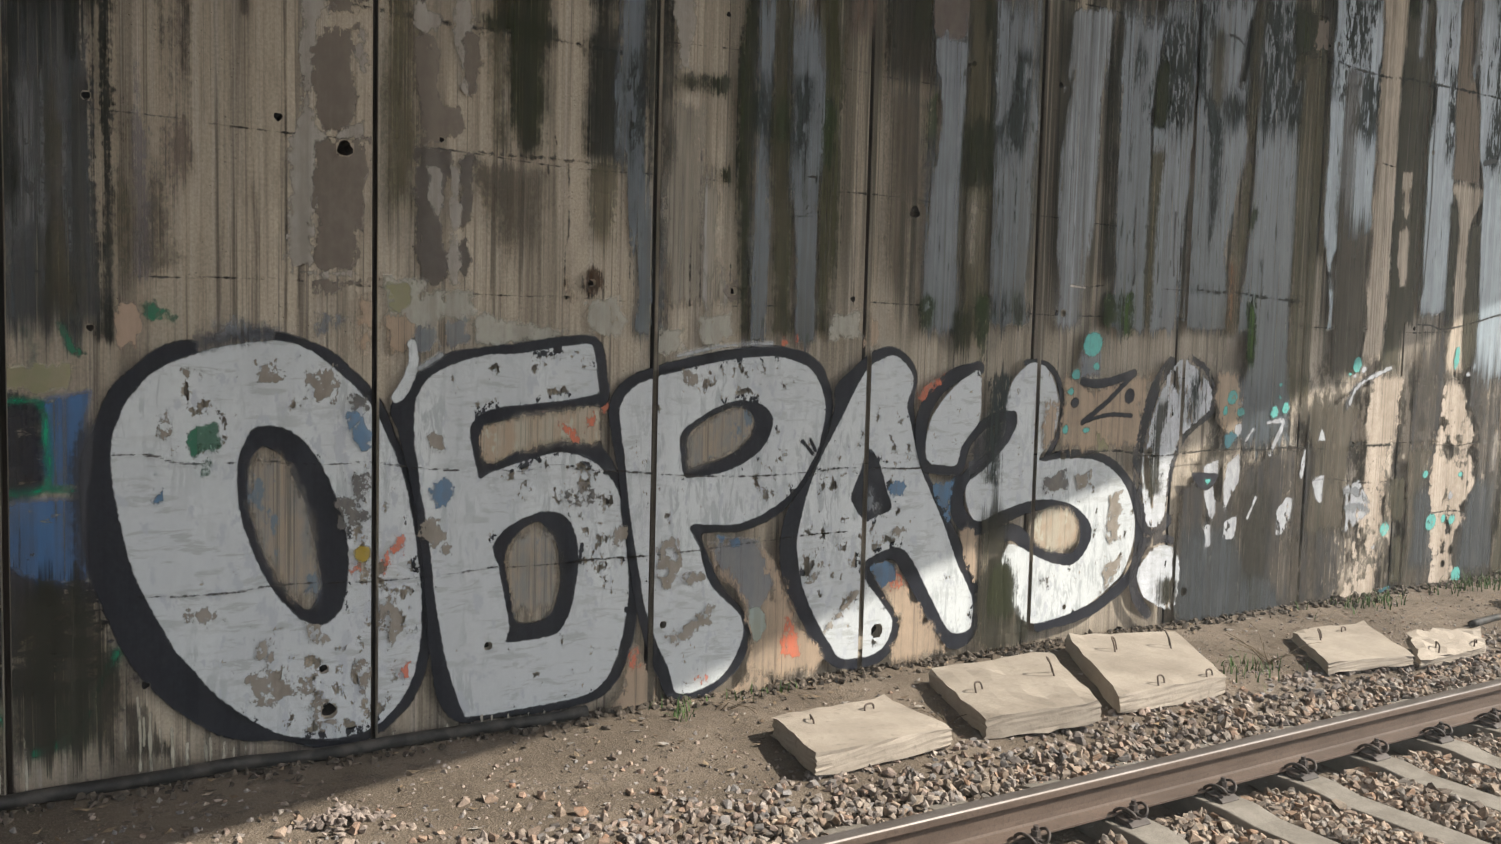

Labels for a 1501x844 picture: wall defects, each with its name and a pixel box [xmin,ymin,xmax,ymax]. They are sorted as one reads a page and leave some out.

peeling [254,358,285,383]
peeling [305,363,372,451]
peeling [155,410,222,476]
peeling [427,431,445,450]
peeling [564,479,600,507]
peeling [334,472,455,575]
peeling [183,607,217,625]
peeling [379,594,404,646]
peeling [244,639,337,729]